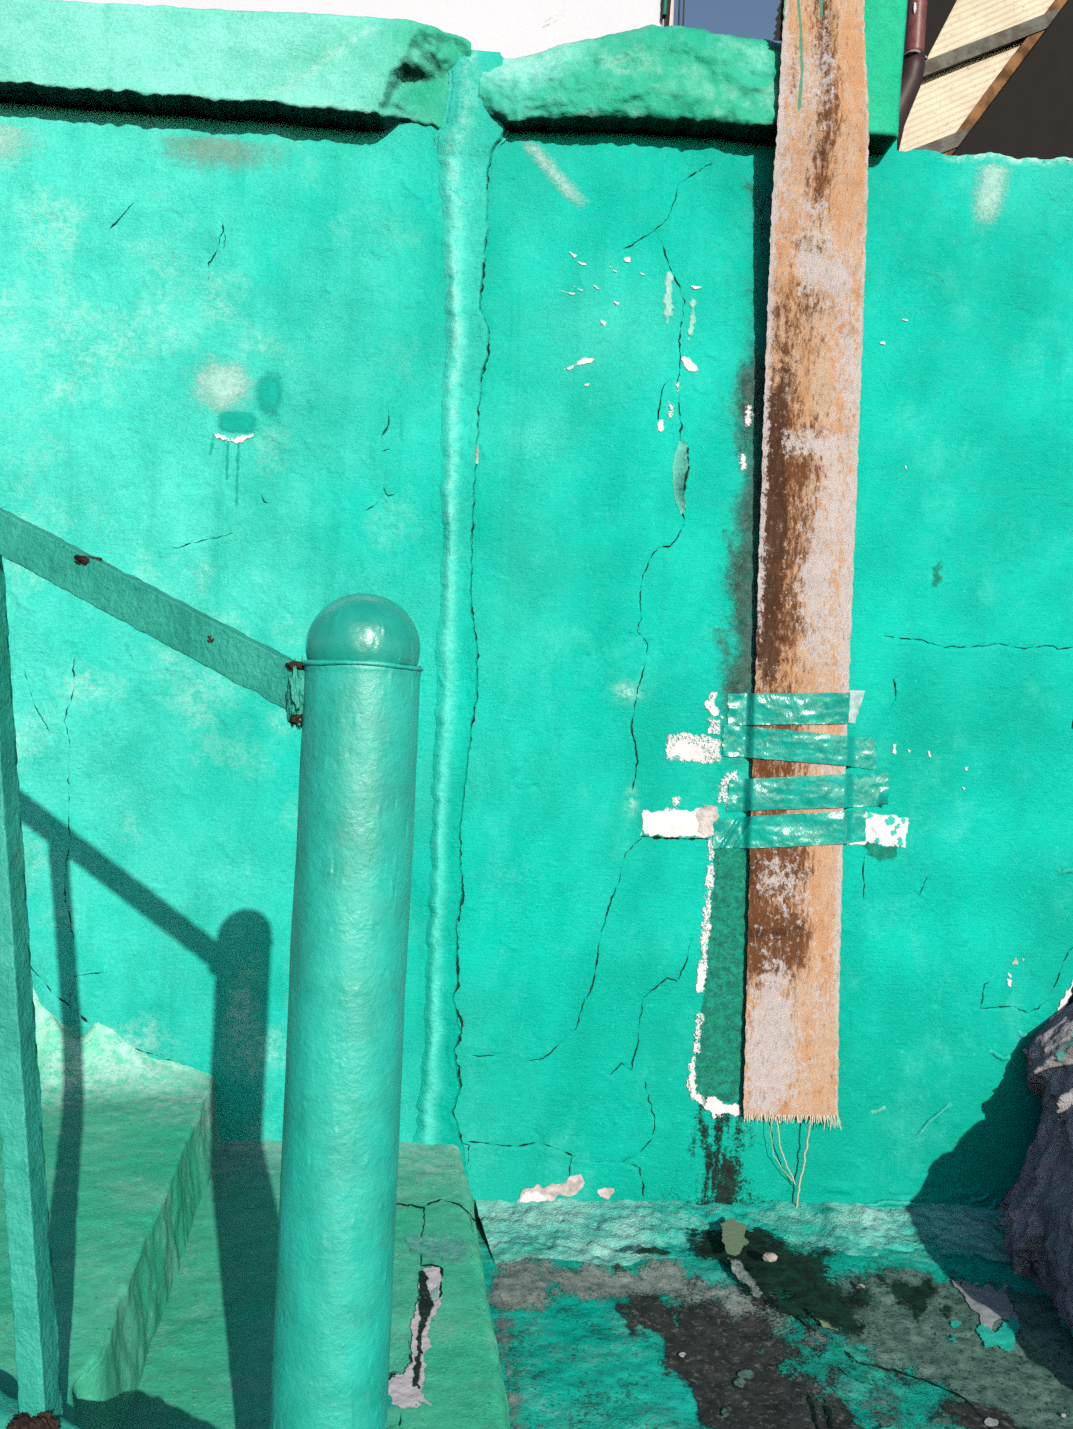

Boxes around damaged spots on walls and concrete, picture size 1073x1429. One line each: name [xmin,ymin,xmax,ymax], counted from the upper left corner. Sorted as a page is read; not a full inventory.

crack [477,239,490,428]
crack [625,163,712,441]
peeling [675,286,701,389]
peeling [672,441,690,514]
crack [884,635,1072,649]
crack [396,468,692,1264]
peeling [847,812,909,848]
water stain [671,848,775,1205]
peeling [517,1174,615,1203]
spalling [388,1264,443,1409]
water stain [486,1285,514,1376]
water stain [508,1393,542,1429]